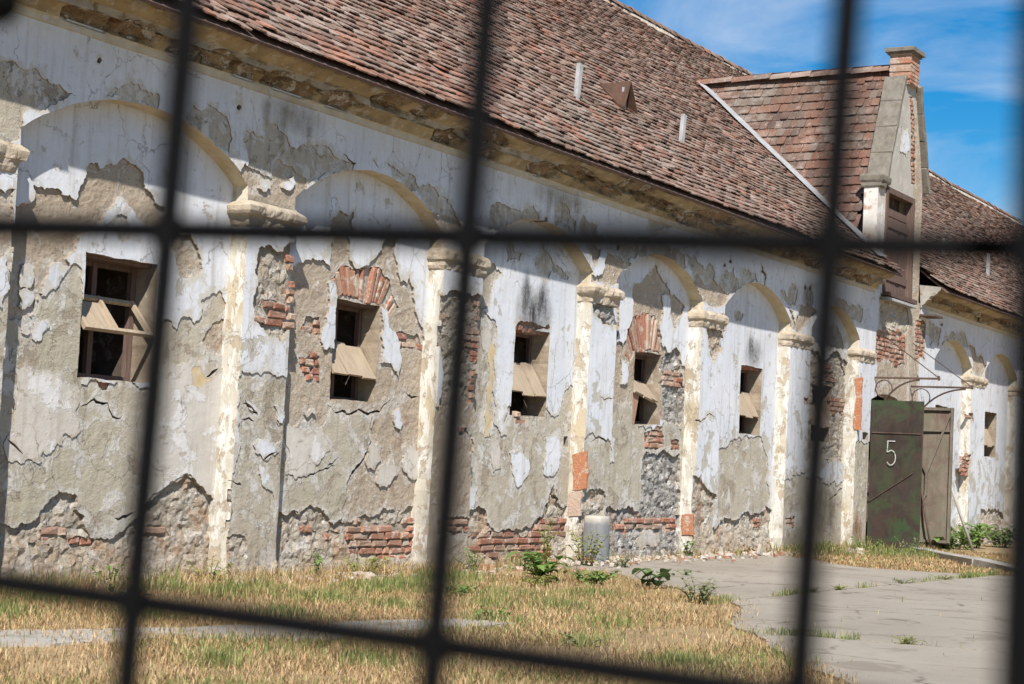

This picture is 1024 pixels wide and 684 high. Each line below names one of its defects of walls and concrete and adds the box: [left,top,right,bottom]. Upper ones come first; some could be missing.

flaking render [0,158,155,216]
flaking render [0,240,152,581]
flaking render [151,291,225,580]
flaking render [226,247,423,576]
flaking render [427,406,439,540]
flaking render [437,294,448,358]
flaking render [457,254,797,566]
flaking render [826,340,869,547]
flaking render [875,297,985,385]